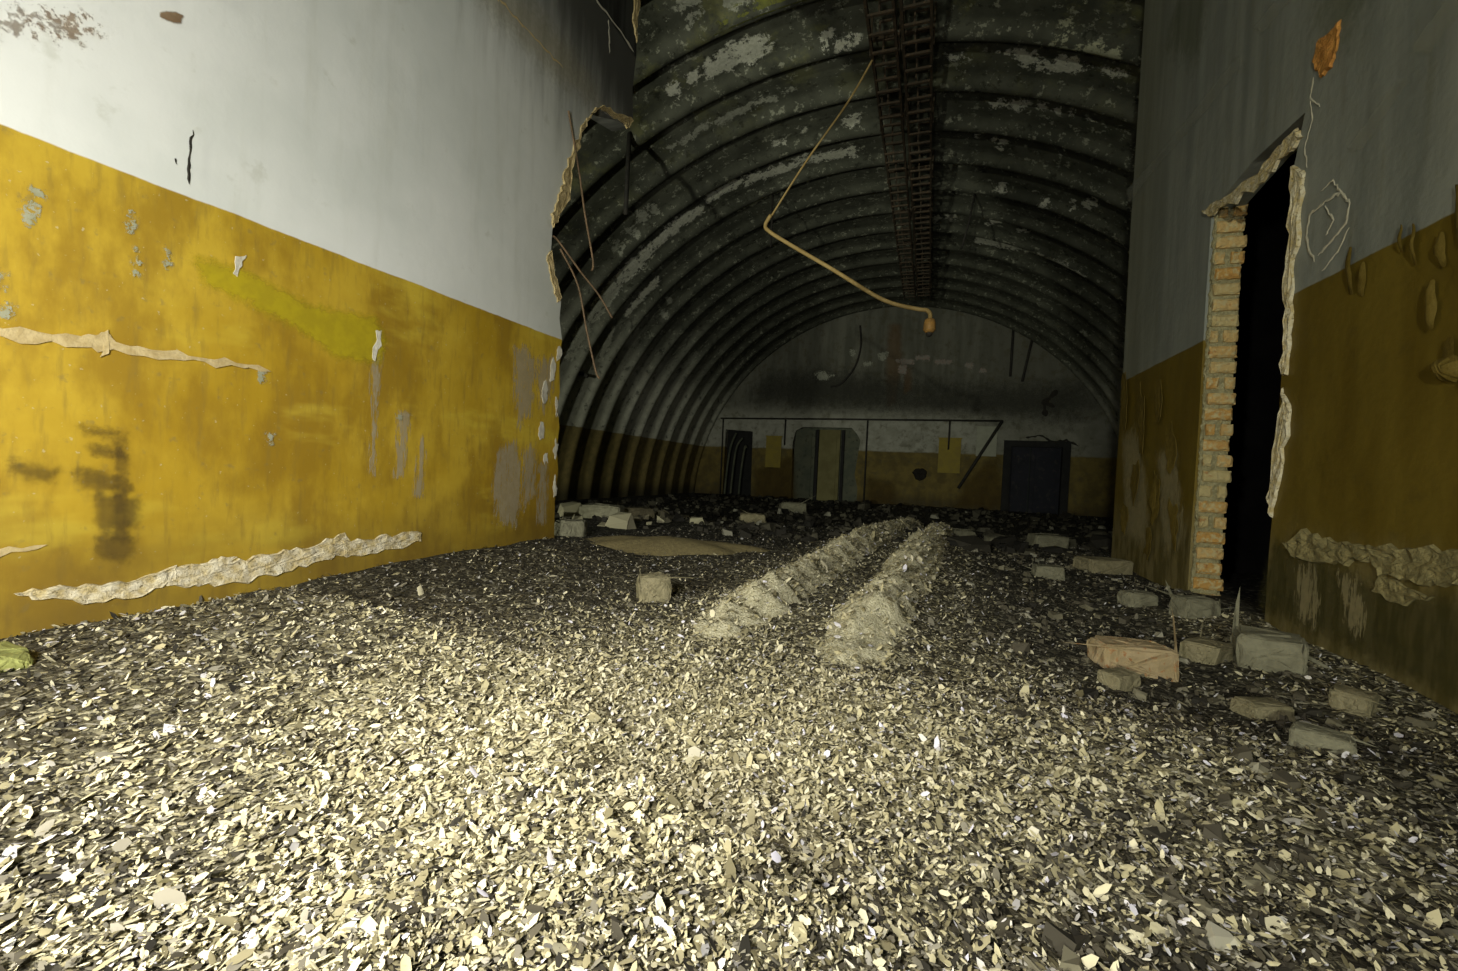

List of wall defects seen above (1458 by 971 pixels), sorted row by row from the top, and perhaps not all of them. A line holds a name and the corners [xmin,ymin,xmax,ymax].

spalling [632,0,641,43]
peeling [664,0,806,101]
peeling [820,27,863,55]
spalling [1312,19,1342,78]
peeling [20,186,47,228]
peeling [233,255,247,277]
peeling [1397,184,1458,360]
peeling [0,271,271,384]
peeling [372,330,382,361]
spalling [1202,128,1366,518]
spalling [15,531,422,605]
spalling [1282,528,1458,607]